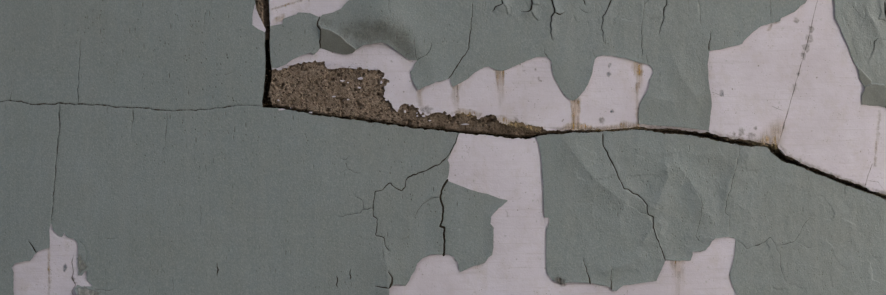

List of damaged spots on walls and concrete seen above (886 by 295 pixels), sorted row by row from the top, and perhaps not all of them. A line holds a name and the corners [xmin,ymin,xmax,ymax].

crack [448,0,612,79]
crack [641,0,667,62]
crack [0,55,242,218]
peeling [252,0,886,295]
crack [253,24,886,261]
peeling [12,224,92,295]